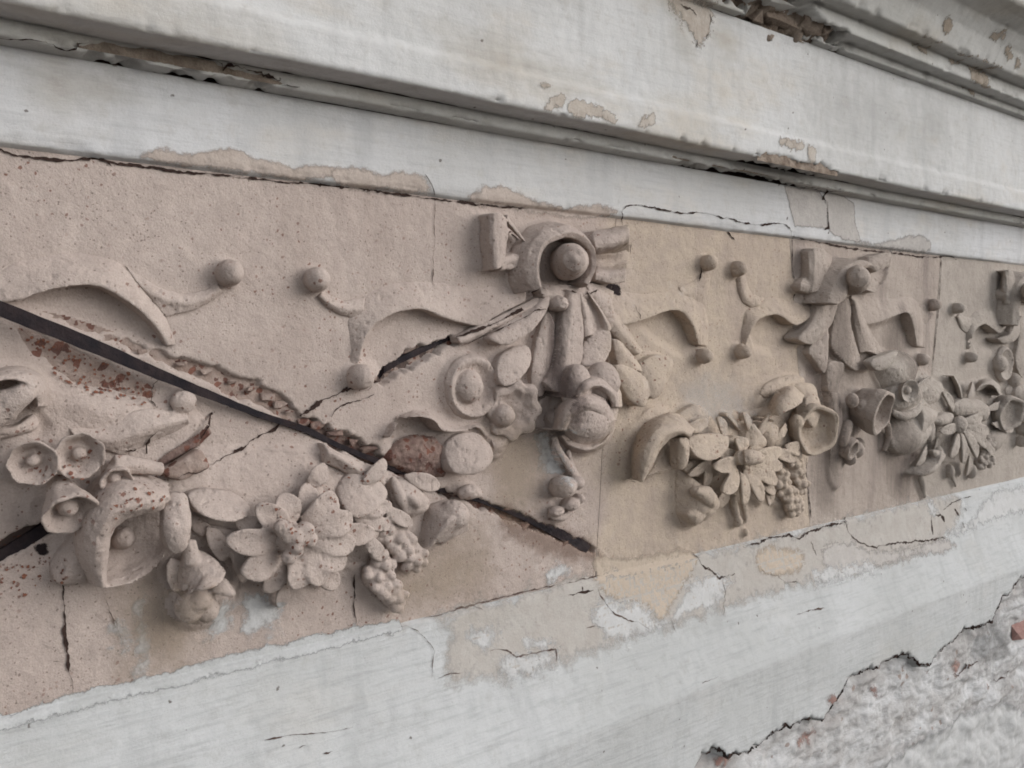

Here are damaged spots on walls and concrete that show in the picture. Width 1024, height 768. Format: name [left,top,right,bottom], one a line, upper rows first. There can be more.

spalling [668,0,833,52]
peeling [989,29,1021,68]
peeling [541,82,618,124]
peeling [141,147,430,194]
spalling [712,138,838,176]
crack [456,280,597,345]
crack [621,190,957,372]
crack [127,380,378,479]
crack [744,457,971,583]
crack [54,583,78,687]
crack [398,575,647,678]
flaking render [695,577,1024,768]